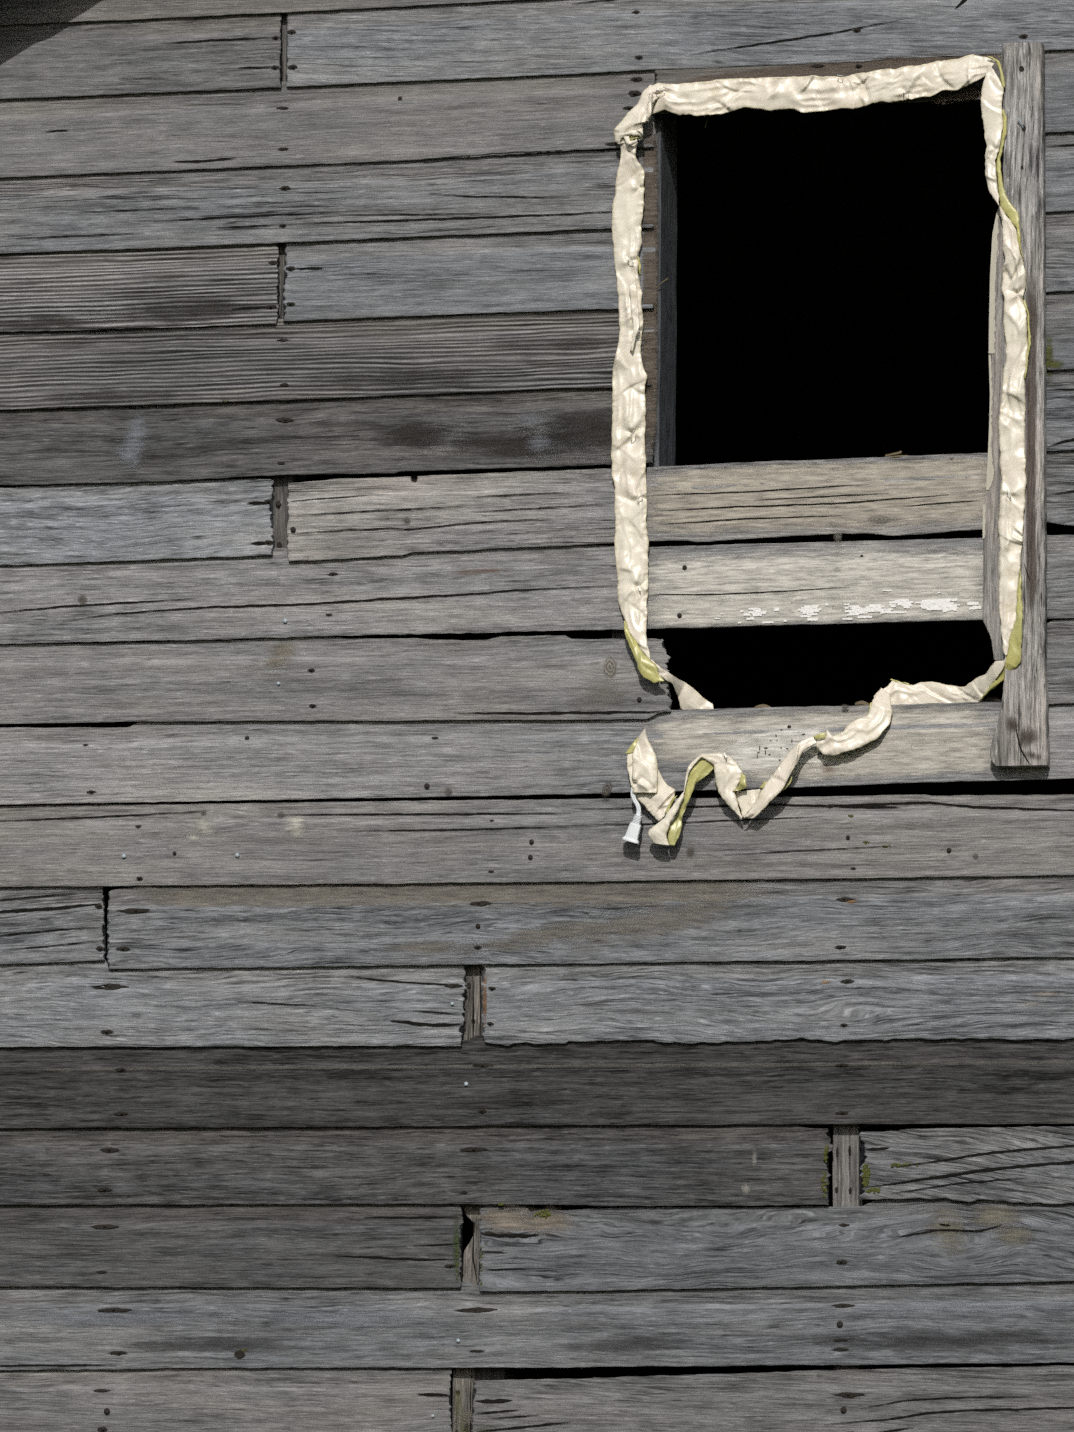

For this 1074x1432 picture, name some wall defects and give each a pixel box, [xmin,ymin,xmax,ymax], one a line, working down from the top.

peeling [738,590,981,624]
crack [849,1143,1074,1194]
crack [892,1224,1002,1238]